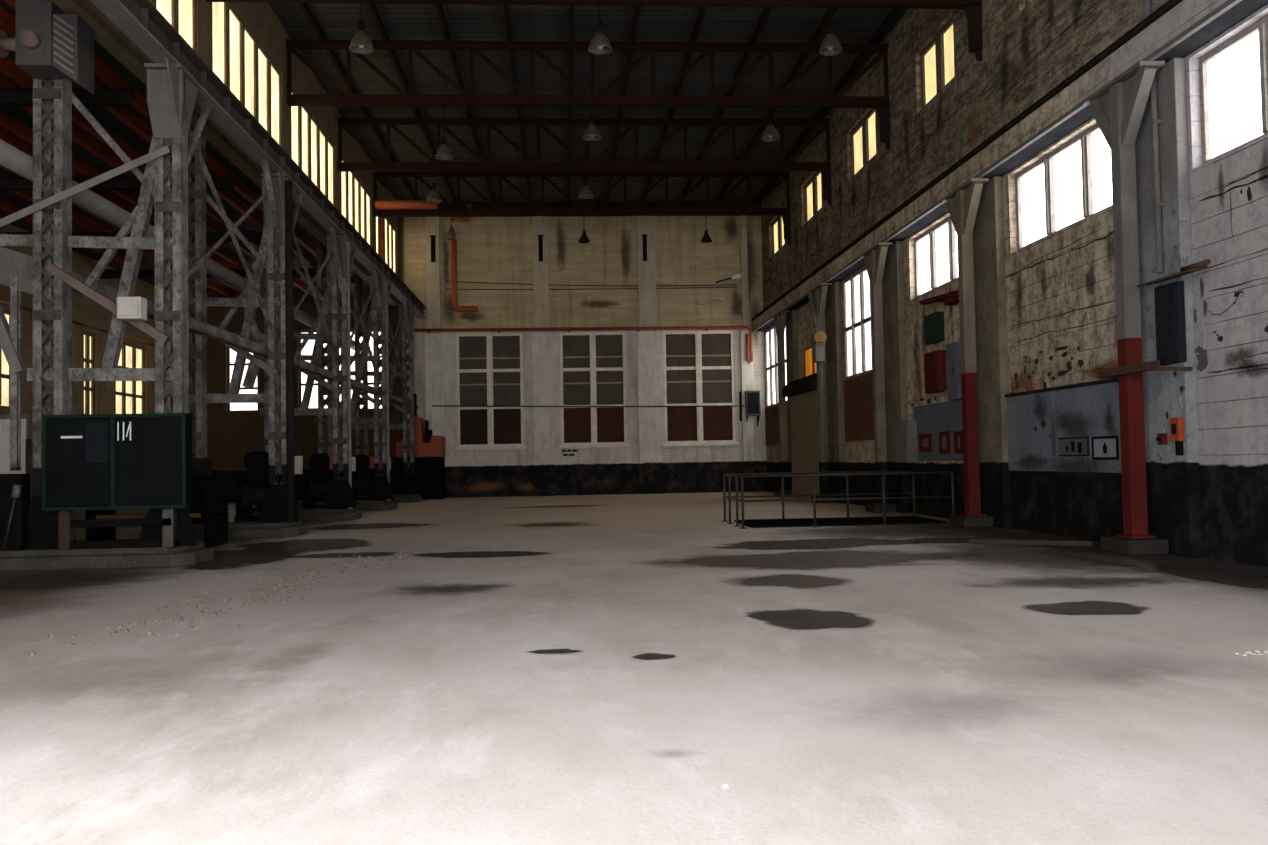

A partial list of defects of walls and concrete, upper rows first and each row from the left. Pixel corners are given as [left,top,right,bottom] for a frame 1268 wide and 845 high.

leakage [1230,351,1264,376]
leakage [1026,601,1147,615]
leakage [747,609,873,629]